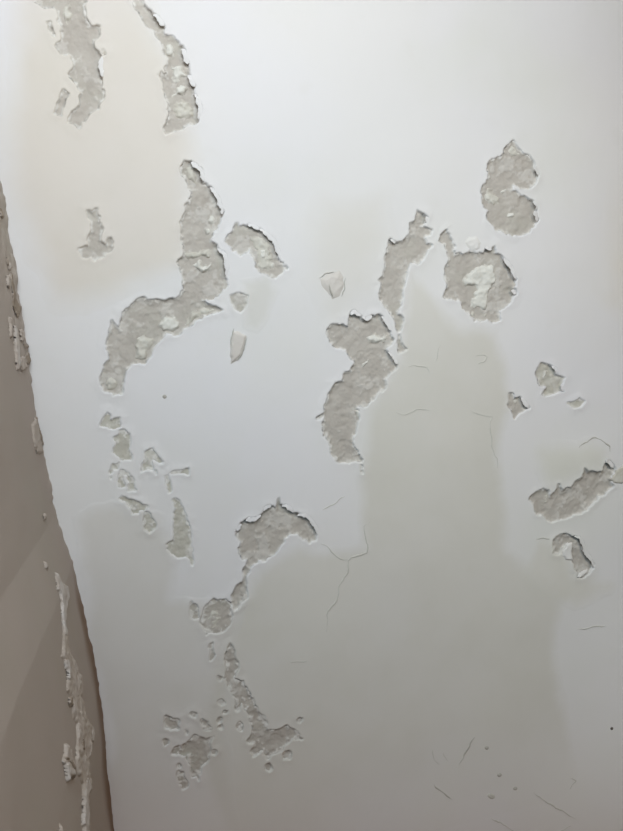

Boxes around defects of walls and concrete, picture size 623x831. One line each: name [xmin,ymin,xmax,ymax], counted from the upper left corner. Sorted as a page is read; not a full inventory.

flaking render [34,0,106,129]
flaking render [131,0,203,135]
flaking render [481,141,540,236]
flaking render [100,161,288,396]
flaking render [316,210,517,473]
flaking render [100,413,156,533]
flaking render [141,449,194,566]
flaking render [190,498,318,660]
flaking render [553,533,594,578]
flaking render [529,458,623,522]
peeling [54,572,95,831]
flaking render [163,644,303,789]